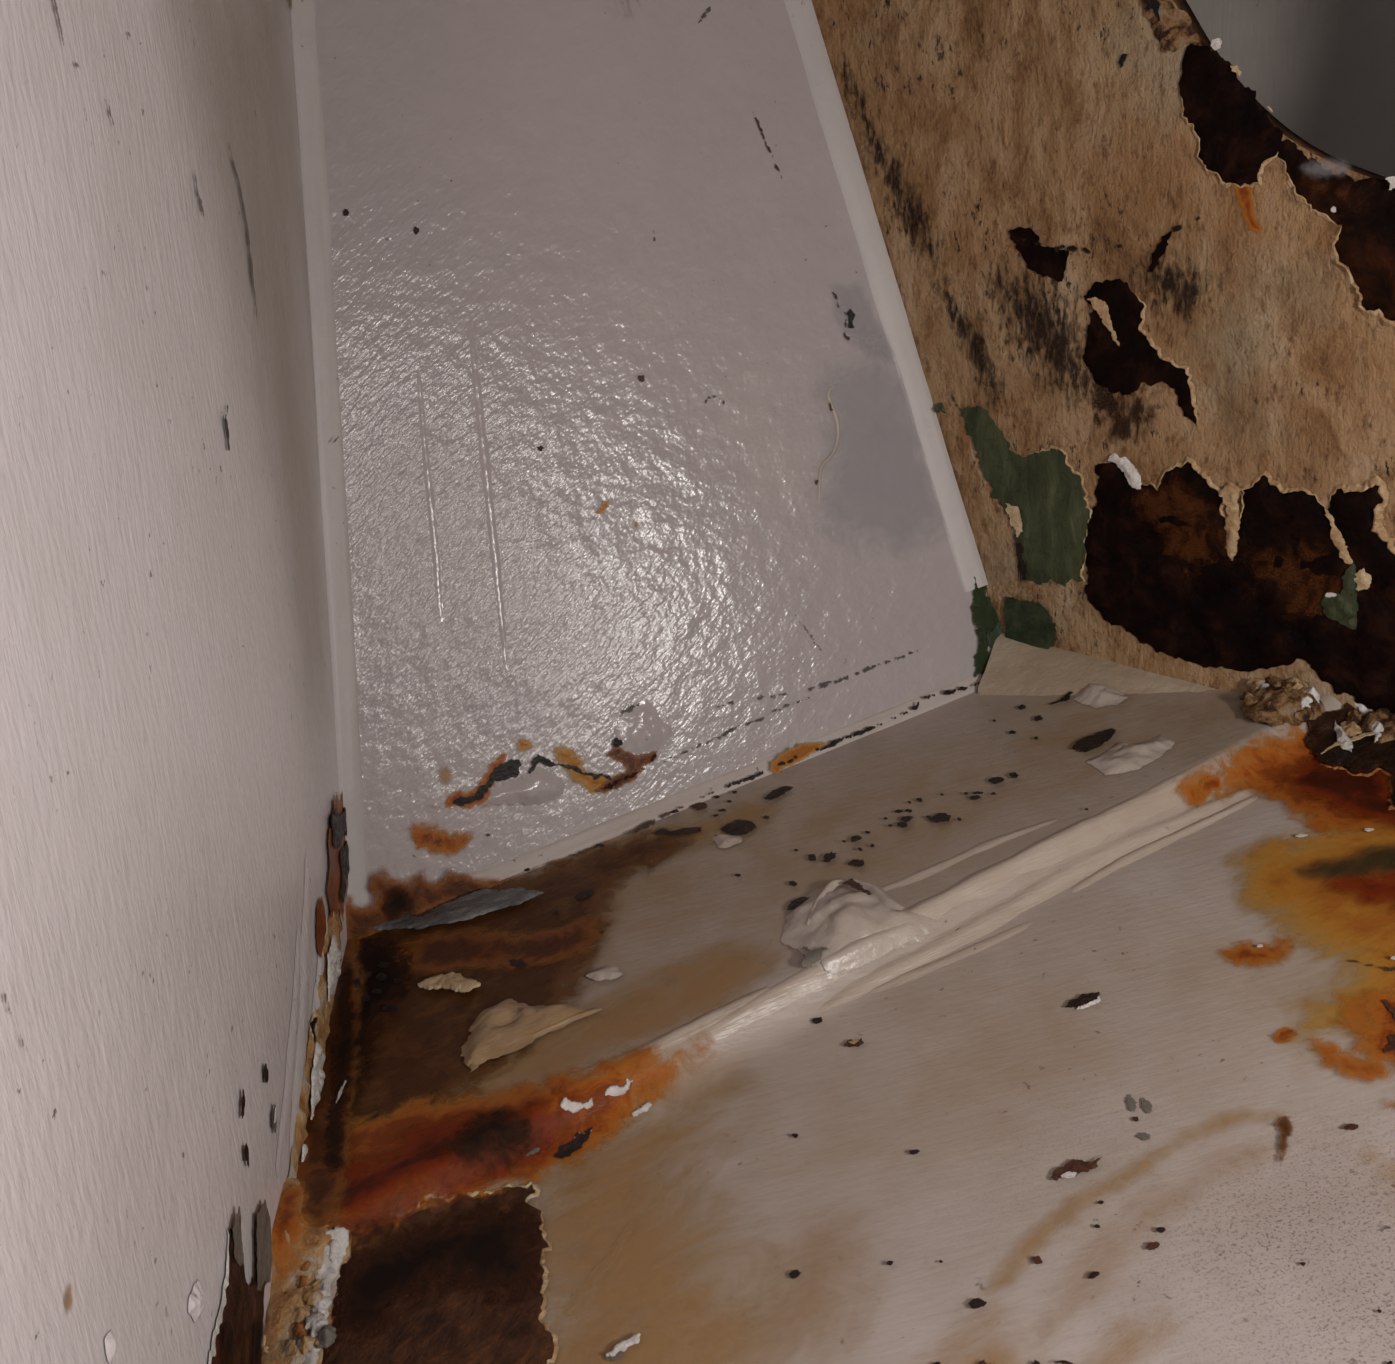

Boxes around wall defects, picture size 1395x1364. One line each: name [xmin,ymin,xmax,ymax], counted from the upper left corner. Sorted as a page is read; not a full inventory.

crack [54,0,79,67]
crack [229,145,258,324]
spalling [1179,38,1395,327]
spalling [1083,278,1395,810]
corrosion [441,769,451,783]
corrosion [517,740,533,751]
peeling [1072,728,1116,752]
corrosion [1177,723,1395,1082]
spalling [208,909,559,1364]
corrosion [296,791,774,1364]
corrosion [998,1155,1152,1284]
corrosion [1275,1116,1293,1161]